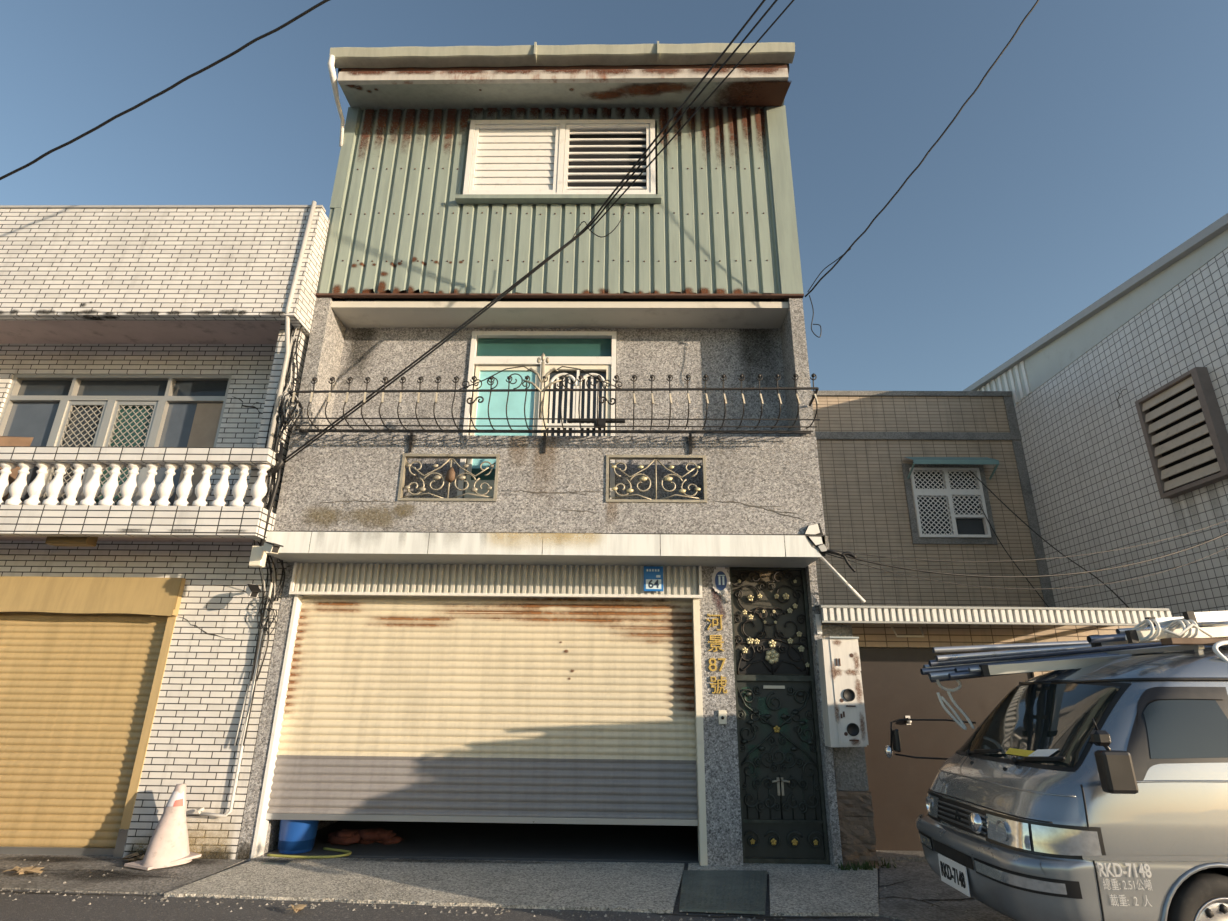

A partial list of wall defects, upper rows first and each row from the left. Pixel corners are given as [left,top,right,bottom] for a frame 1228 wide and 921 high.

rust [347,68,792,157]
rust [332,257,463,293]
rust [285,602,358,706]
rust [380,598,695,711]